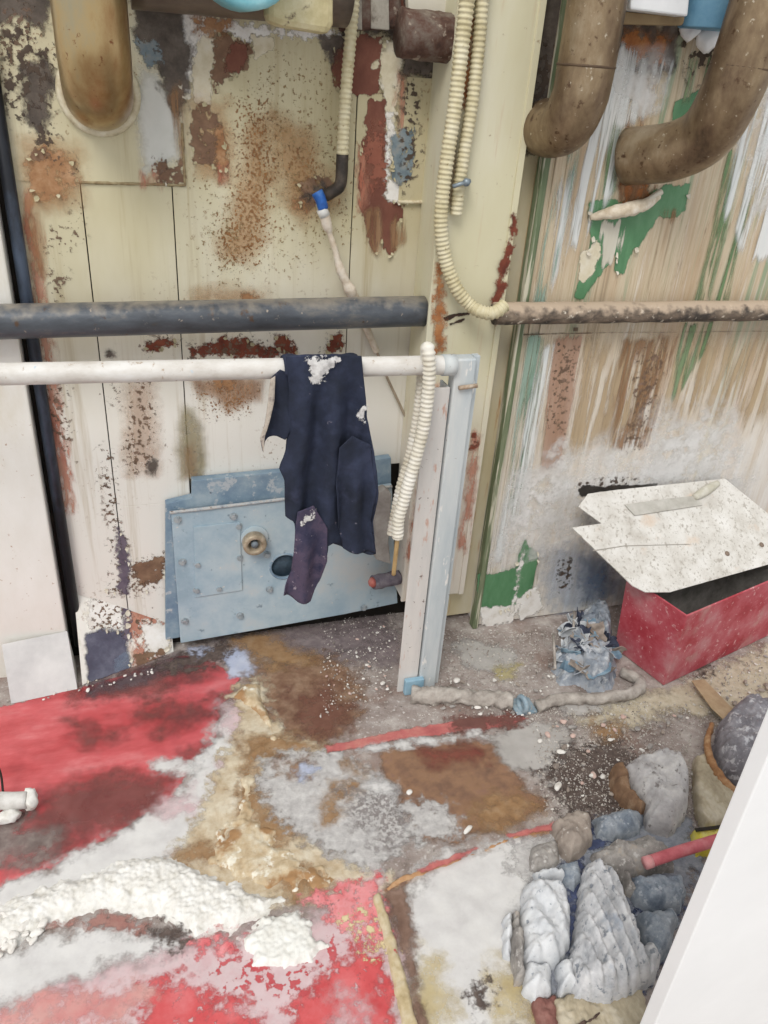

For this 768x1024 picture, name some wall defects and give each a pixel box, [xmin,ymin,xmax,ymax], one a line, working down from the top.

corrosion [23,144,84,303]
corrosion [142,58,347,299]
peeling [178,14,424,258]
corrosion [491,212,518,303]
peeling [574,121,691,300]
corrosion [46,384,74,513]
corrosion [99,382,158,550]
corrosion [195,380,260,418]
corrosion [541,334,582,472]
corrosion [624,336,677,447]
spalling [84,527,171,684]
peeling [477,540,545,626]